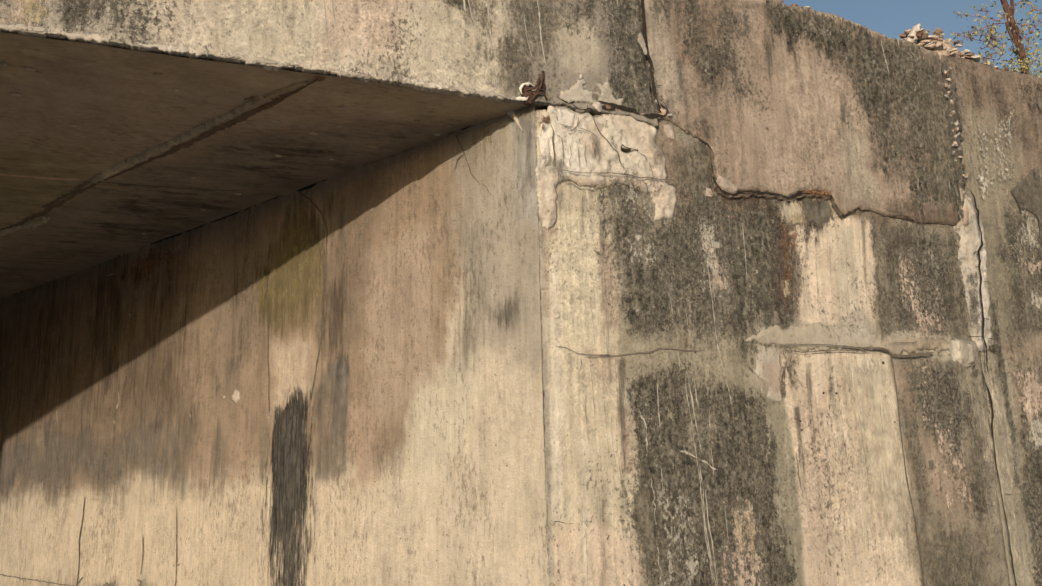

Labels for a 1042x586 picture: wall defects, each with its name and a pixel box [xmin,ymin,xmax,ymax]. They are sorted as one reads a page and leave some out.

spalling [0,24,112,44]
spalling [134,42,202,57]
spalling [223,53,294,68]
flaking render [390,71,677,229]
crack [550,0,675,194]
crack [700,139,953,227]
leakage [763,0,971,338]
leakage [582,119,832,586]
crack [969,188,1017,586]
crack [0,497,109,586]
crack [173,509,181,586]
leakage [261,360,347,586]